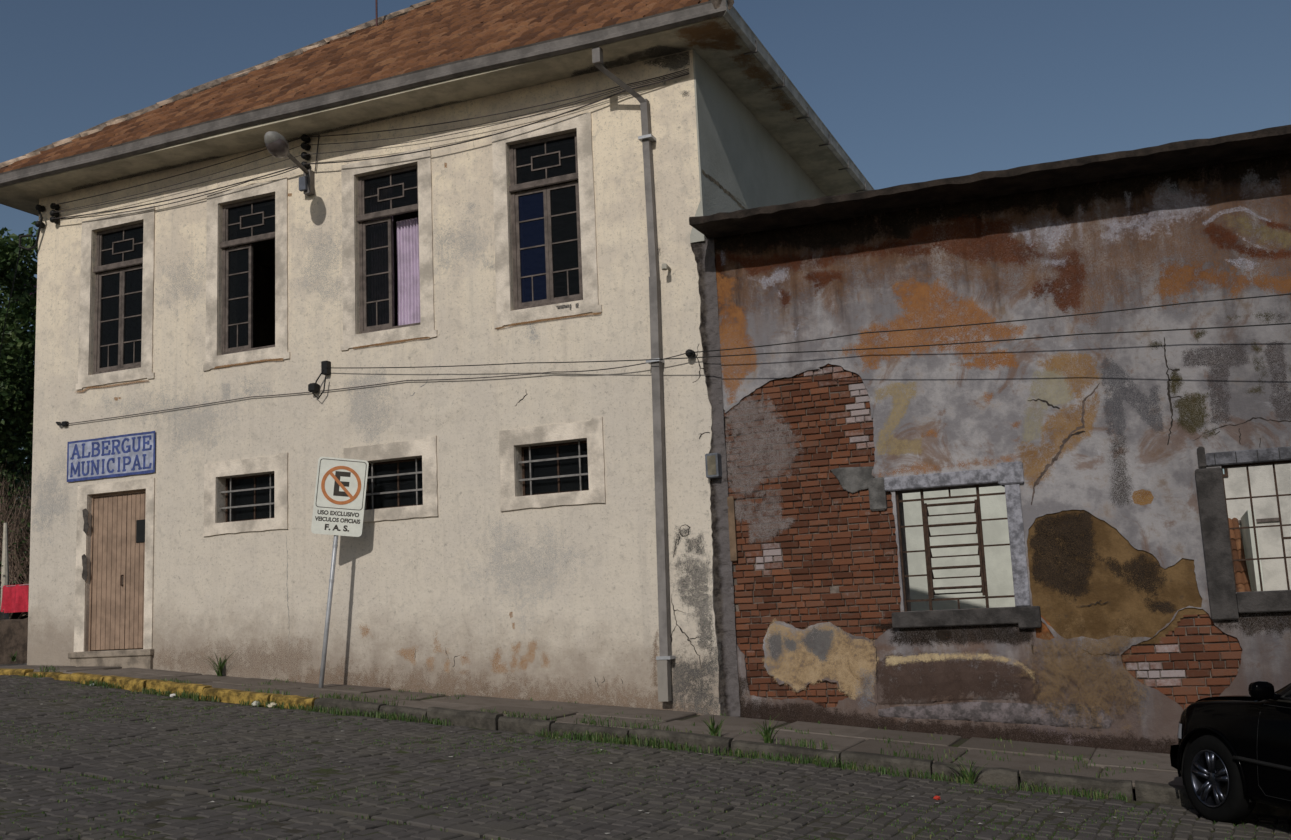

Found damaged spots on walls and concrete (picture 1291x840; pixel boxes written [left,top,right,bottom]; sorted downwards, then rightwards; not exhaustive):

water stain [714,153,1291,342]
flaking render [691,238,901,717]
crack [1028,383,1100,505]
crack [1164,337,1291,447]
water stain [153,510,1178,754]
flaking render [1027,510,1242,710]